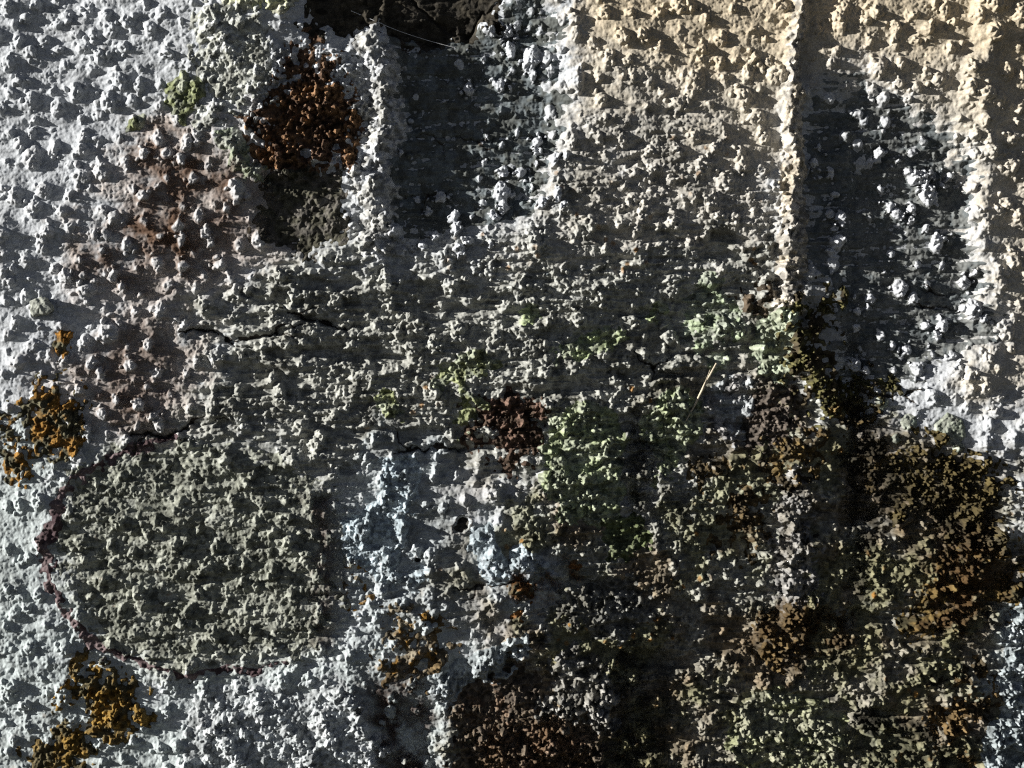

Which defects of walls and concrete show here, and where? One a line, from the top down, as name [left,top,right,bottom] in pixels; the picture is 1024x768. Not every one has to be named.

crack [178,306,357,348]
damp [856,714,879,749]